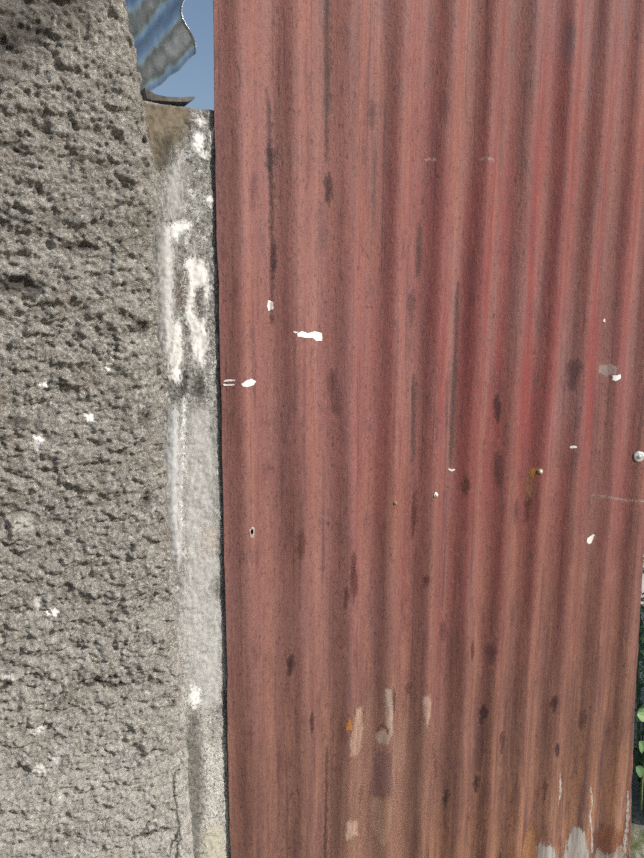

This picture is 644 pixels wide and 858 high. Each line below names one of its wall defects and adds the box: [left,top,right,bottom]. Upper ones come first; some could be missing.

leakage [168,255,210,385]
peeling [346,707,364,757]
peeling [376,689,393,744]
peeling [346,820,358,840]
peeling [536,787,630,858]
corrosion [599,828,621,854]